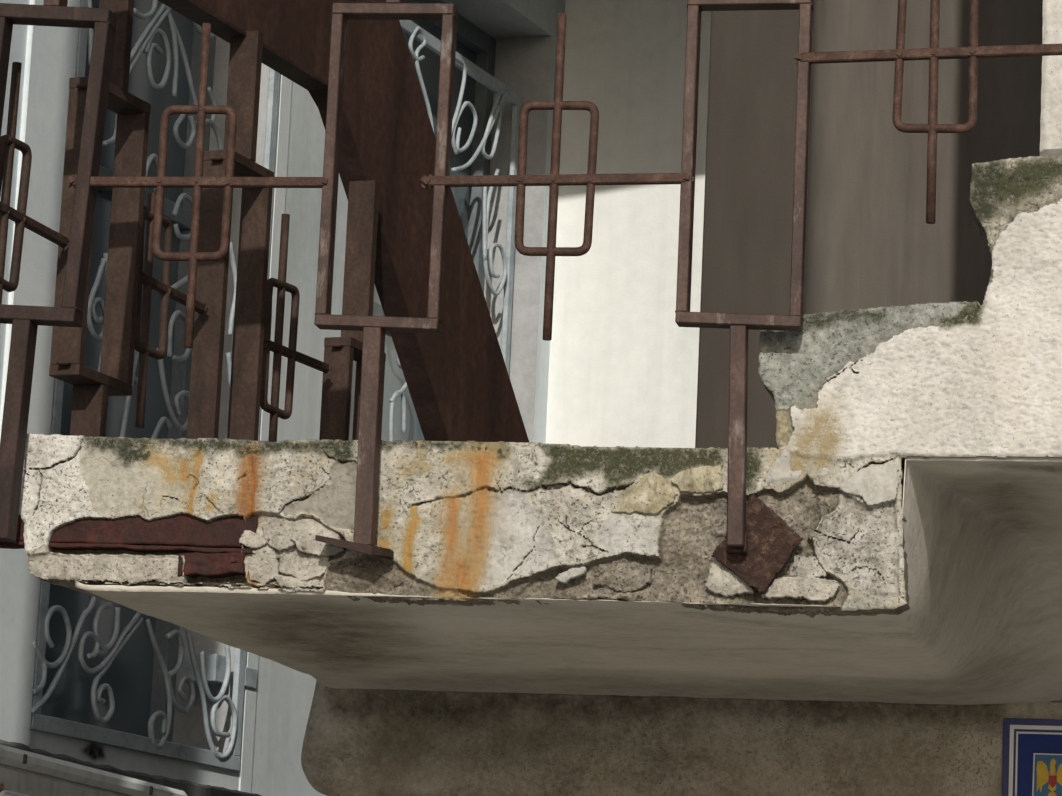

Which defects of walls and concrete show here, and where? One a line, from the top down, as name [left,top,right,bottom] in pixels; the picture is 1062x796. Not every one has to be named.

flaking render [969,155,1062,287]
crack [25,438,83,516]
corrosion [145,450,203,518]
corrosion [237,448,260,522]
corrosion [435,448,501,601]
spalling [27,300,979,614]
crack [408,470,650,579]